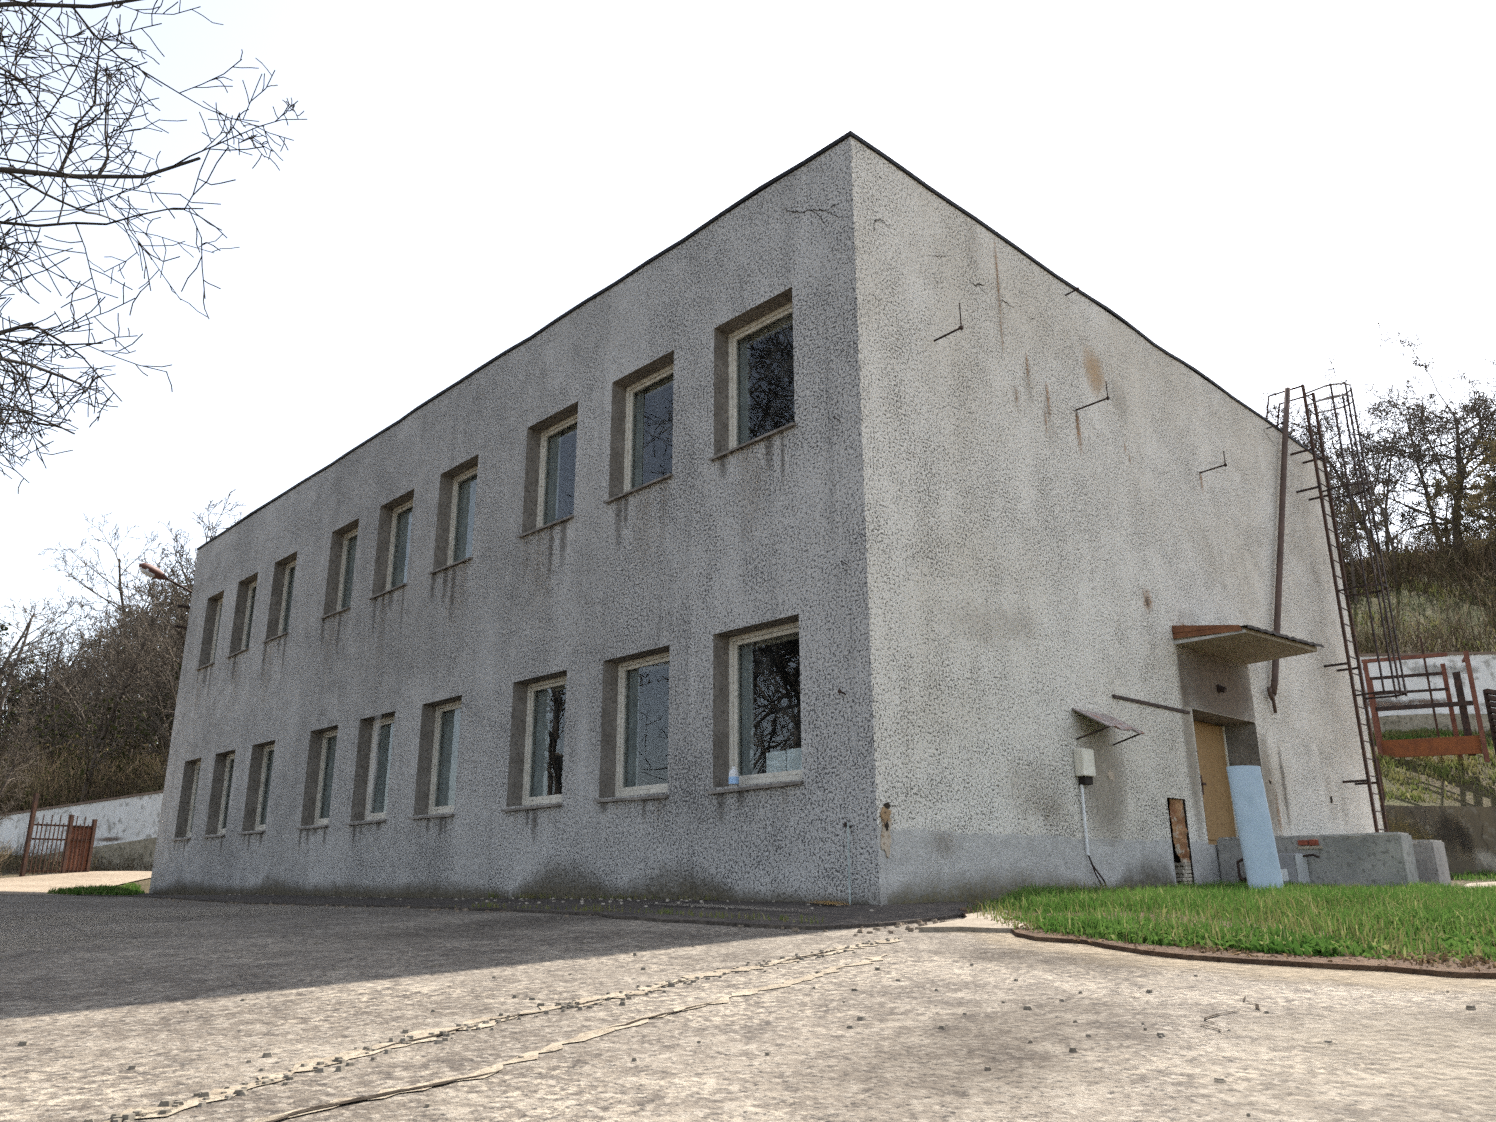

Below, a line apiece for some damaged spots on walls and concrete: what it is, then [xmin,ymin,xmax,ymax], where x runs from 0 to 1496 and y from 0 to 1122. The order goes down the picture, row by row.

crack [778,203,887,230]